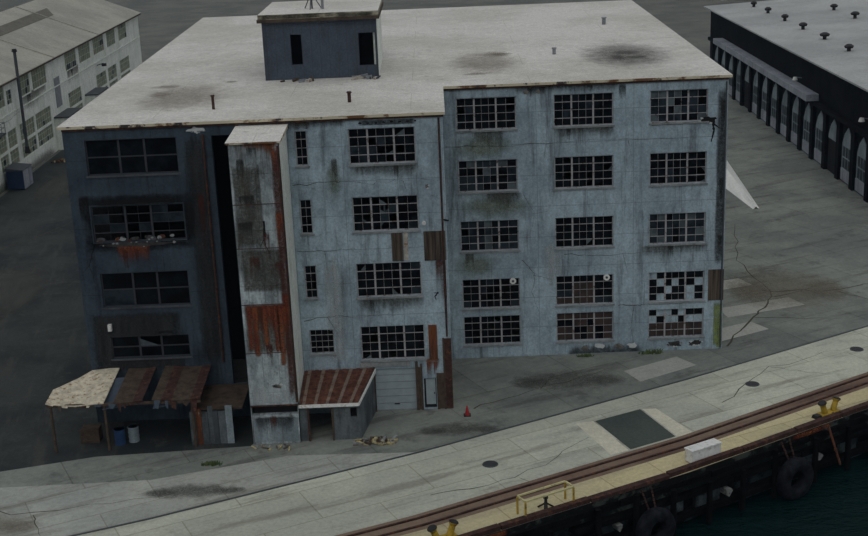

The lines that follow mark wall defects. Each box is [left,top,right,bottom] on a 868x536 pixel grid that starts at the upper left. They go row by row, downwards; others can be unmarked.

rust [244,143,294,393]
crack [726,230,863,346]